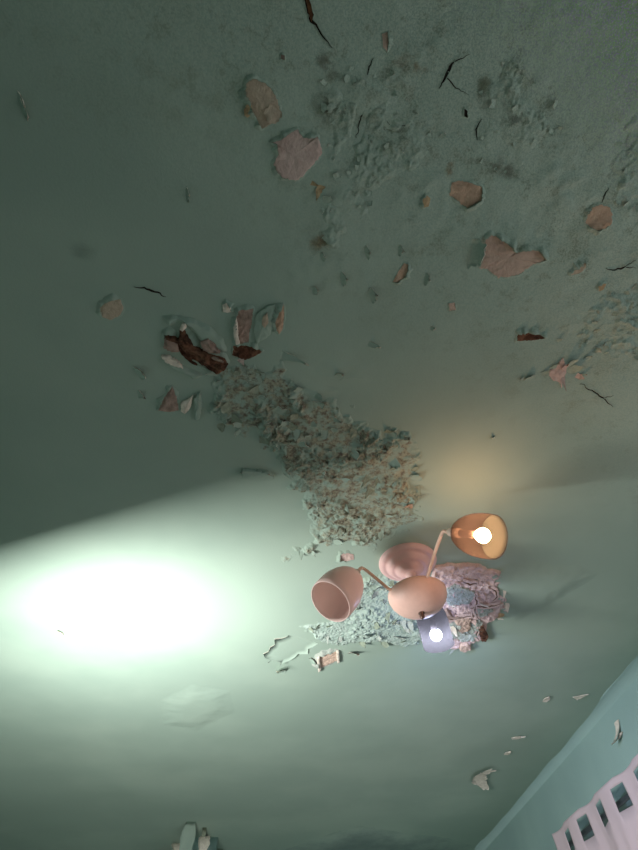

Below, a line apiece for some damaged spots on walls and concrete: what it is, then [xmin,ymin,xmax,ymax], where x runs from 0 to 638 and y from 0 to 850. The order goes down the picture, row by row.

crack [303,0,333,49]
crack [438,53,470,96]
spalling [237,73,332,204]
spalling [448,179,486,212]
spalling [583,202,614,236]
spalling [467,230,549,279]
crack [134,285,167,298]
crack [580,382,614,408]
peeling [156,299,424,564]
peeling [263,573,422,673]
spalling [431,562,510,654]
peeling [471,769,496,790]